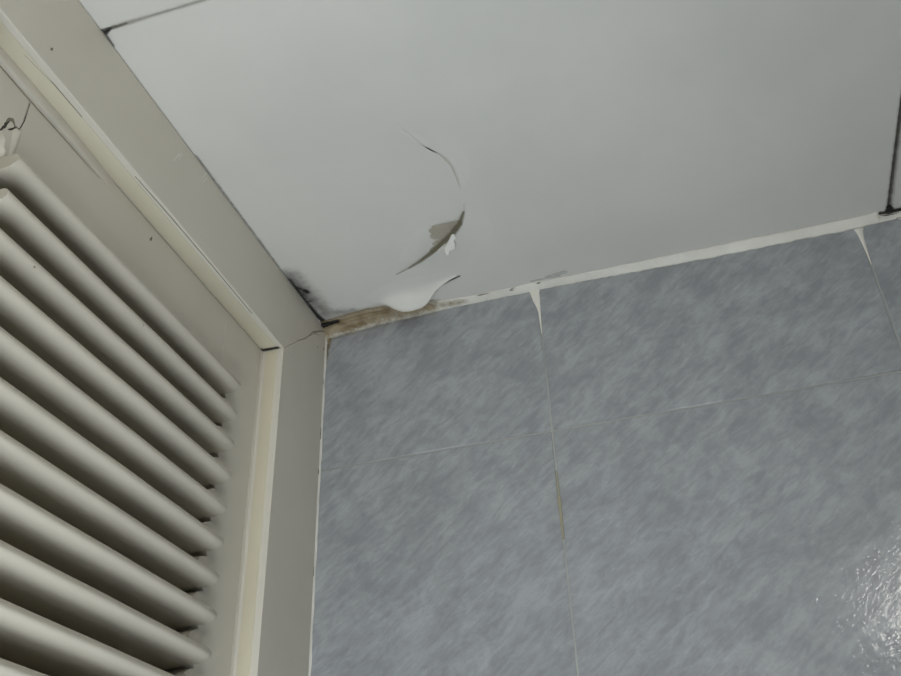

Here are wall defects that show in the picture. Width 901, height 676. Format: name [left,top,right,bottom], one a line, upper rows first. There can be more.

peeling [399,204,493,274]
water stain [288,279,333,327]